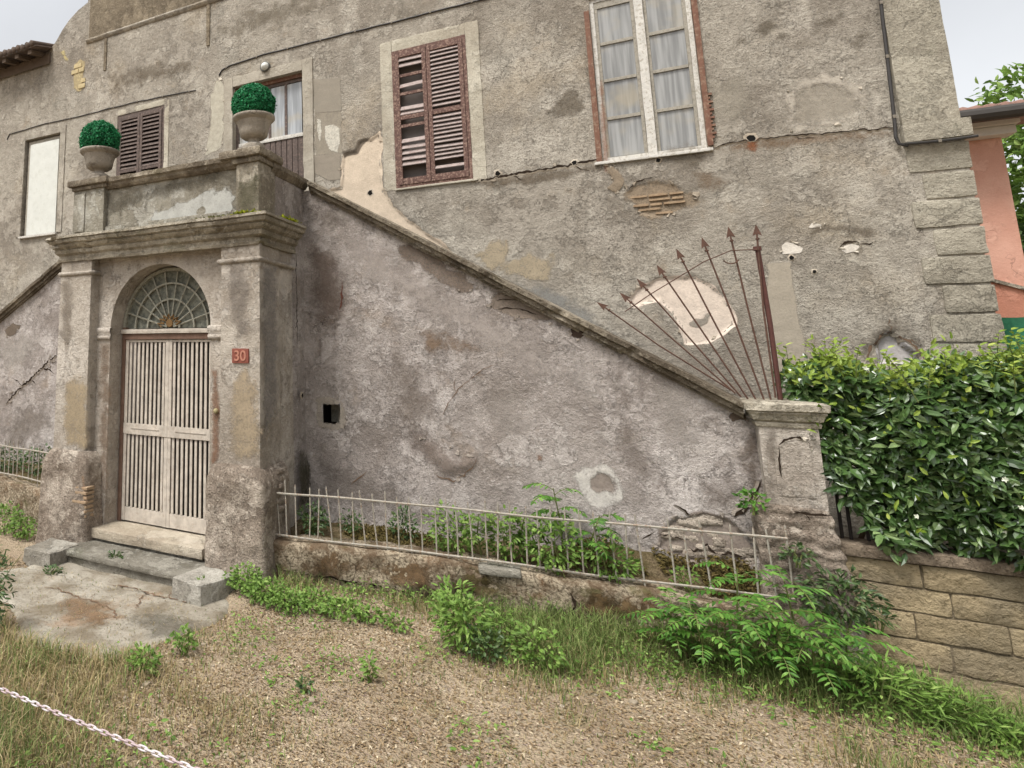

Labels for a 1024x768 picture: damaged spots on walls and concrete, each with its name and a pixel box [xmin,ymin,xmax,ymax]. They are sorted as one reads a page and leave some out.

crack [714,126,898,149]
spalling [316,111,479,293]
crack [475,159,603,183]
spalling [603,164,700,219]
spalling [780,241,803,261]
spalling [839,243,859,253]
spalling [627,275,738,345]
crack [6,354,57,405]
crack [731,436,810,517]
crack [44,585,185,618]